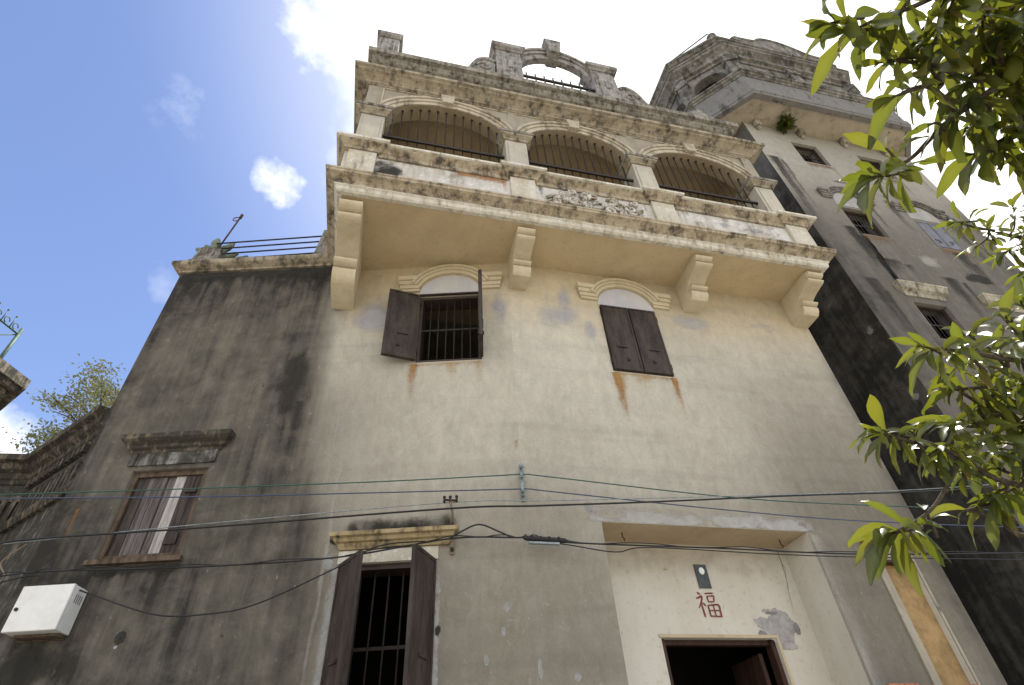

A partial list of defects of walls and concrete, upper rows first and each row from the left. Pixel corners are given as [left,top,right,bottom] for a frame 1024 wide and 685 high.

water stain [279,353,308,415]
corrosion [613,372,624,399]
water stain [349,518,451,531]
peeling [753,608,801,650]